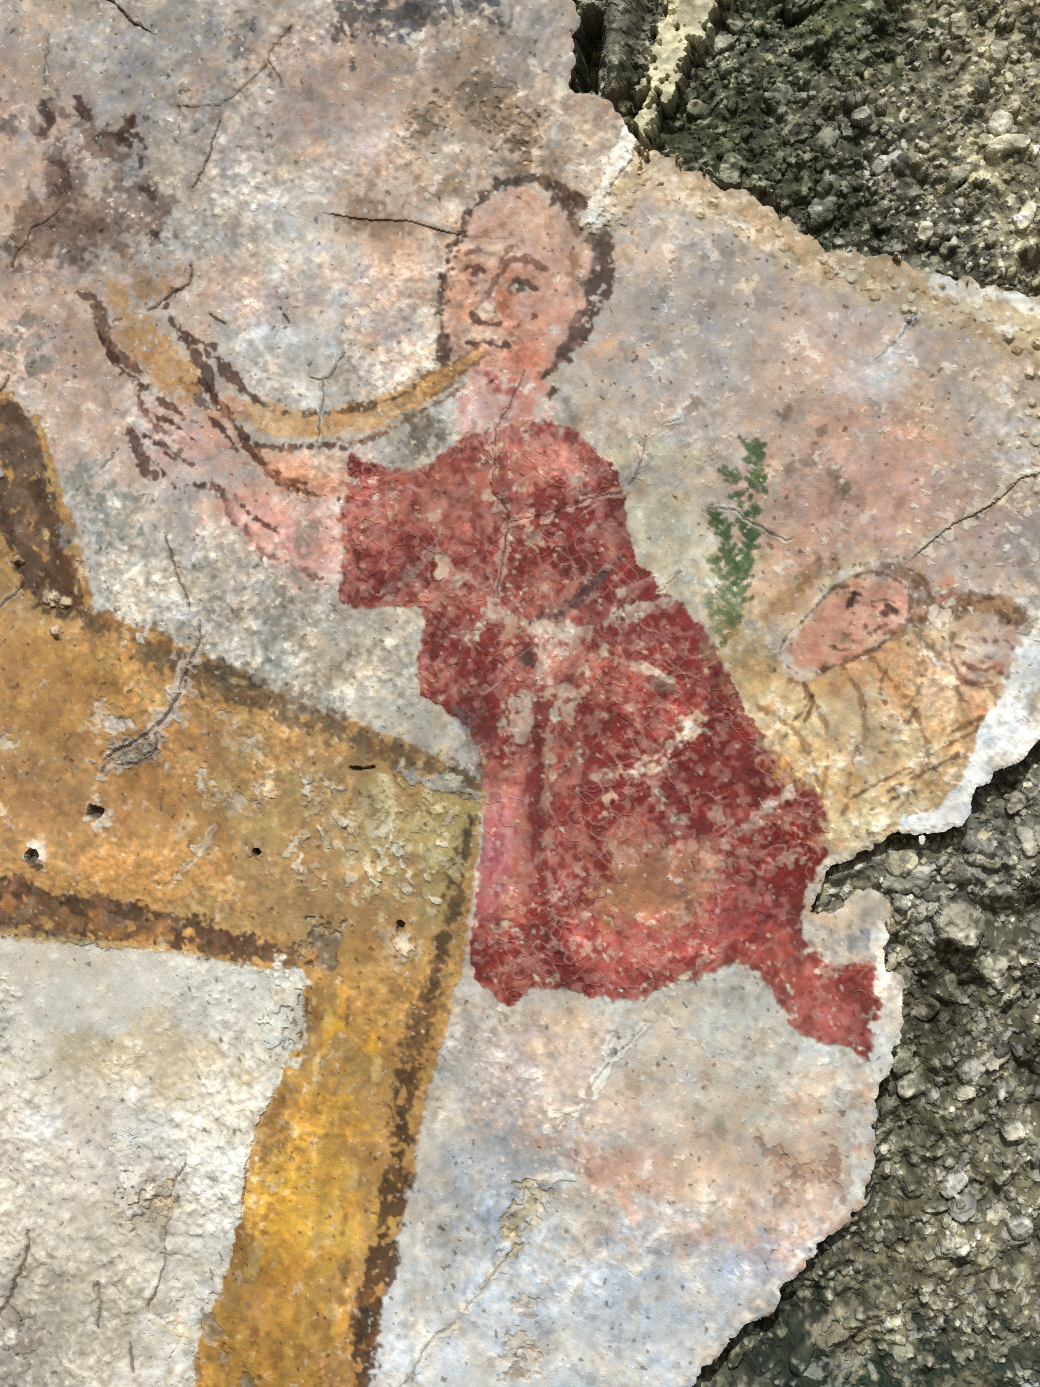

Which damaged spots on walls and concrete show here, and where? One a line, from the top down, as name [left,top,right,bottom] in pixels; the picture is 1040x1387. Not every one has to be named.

spalling [568,1,581,93]
crack [179,27,293,188]
crack [367,220,509,240]
crack [923,472,1040,550]
peeling [434,555,473,589]
crack [102,534,202,773]
peeling [481,587,677,796]
peeling [590,710,709,817]
peeling [749,784,797,829]
peeling [588,829,720,937]
spalling [754,1133,860,1220]
spalling [498,1293,544,1384]